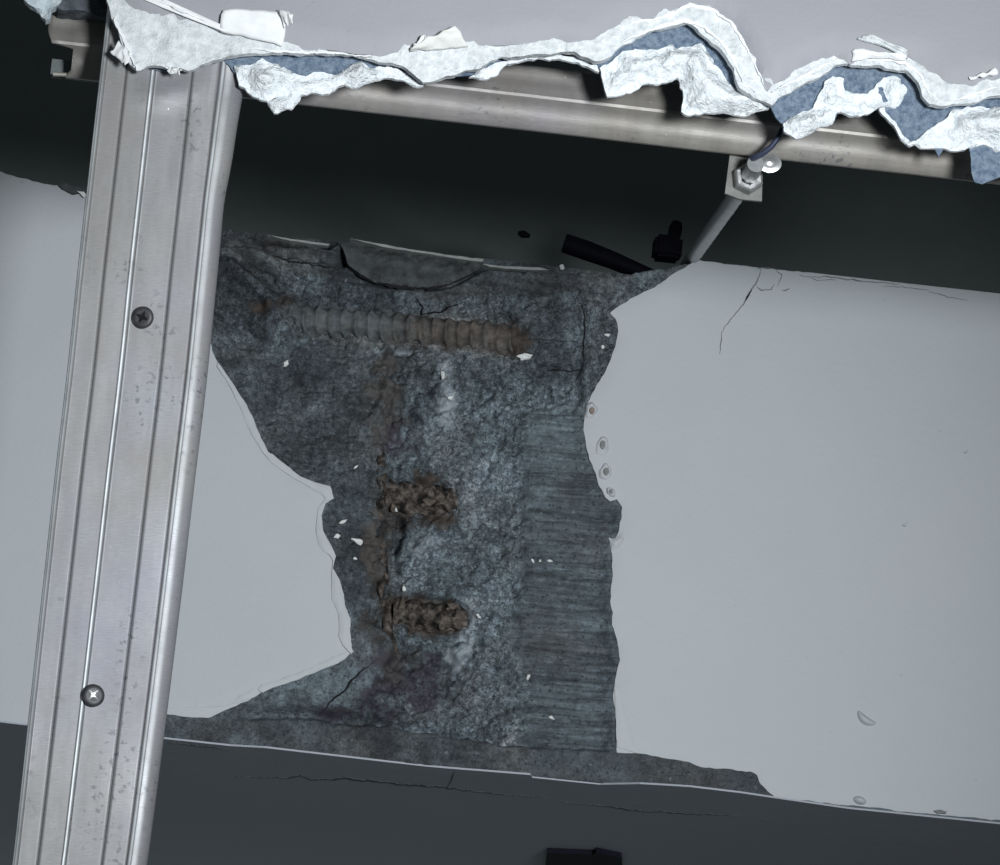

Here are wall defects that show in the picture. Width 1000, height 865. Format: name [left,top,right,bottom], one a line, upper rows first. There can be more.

crack [265,253,470,316]
crack [720,267,964,351]
rust [391,469,453,530]
spalling [164,229,773,796]
crack [320,661,375,714]
crack [235,772,731,816]